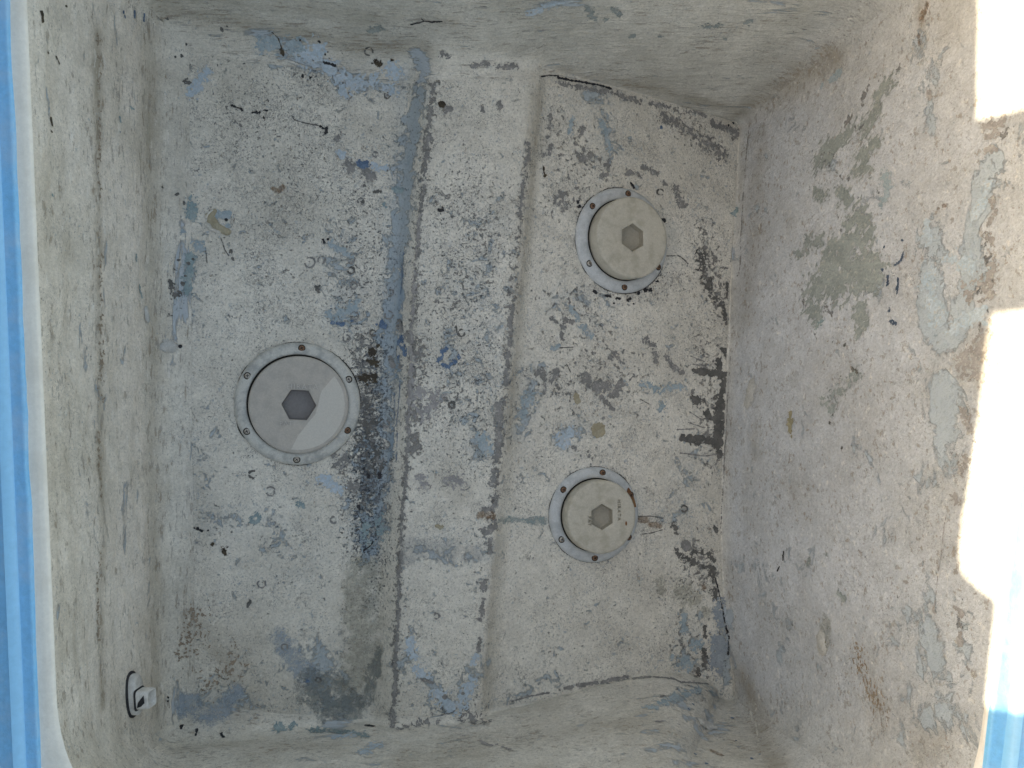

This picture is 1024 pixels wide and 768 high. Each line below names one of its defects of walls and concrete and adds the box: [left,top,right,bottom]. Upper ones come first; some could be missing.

peeling [253,28,394,100]
crack [541,75,612,90]
peeling [789,69,904,347]
peeling [913,177,1000,389]
peeling [315,81,492,736]